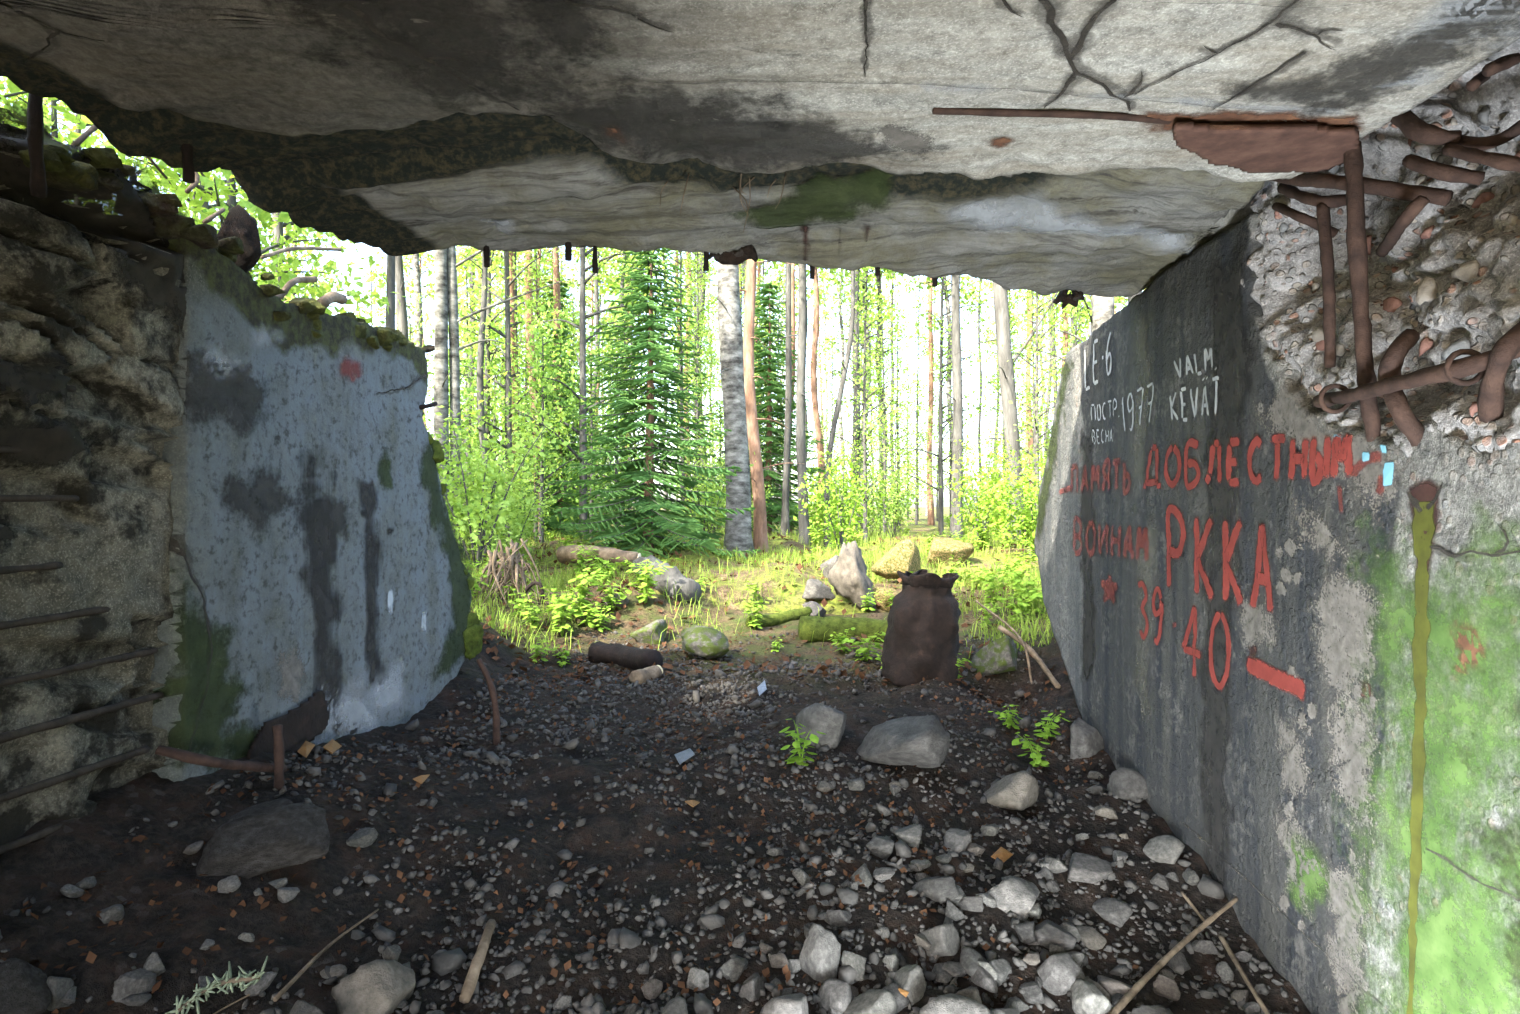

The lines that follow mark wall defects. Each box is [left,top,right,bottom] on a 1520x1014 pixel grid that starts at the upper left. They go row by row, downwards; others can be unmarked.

crack [799,0,1385,113]
spalling [181,143,195,184]
rust [991,137,1012,148]
rust [1145,111,1363,132]
spalling [217,204,261,273]
spalling [0,93,185,854]
spalling [1235,39,1520,1014]
leakage [222,455,400,729]